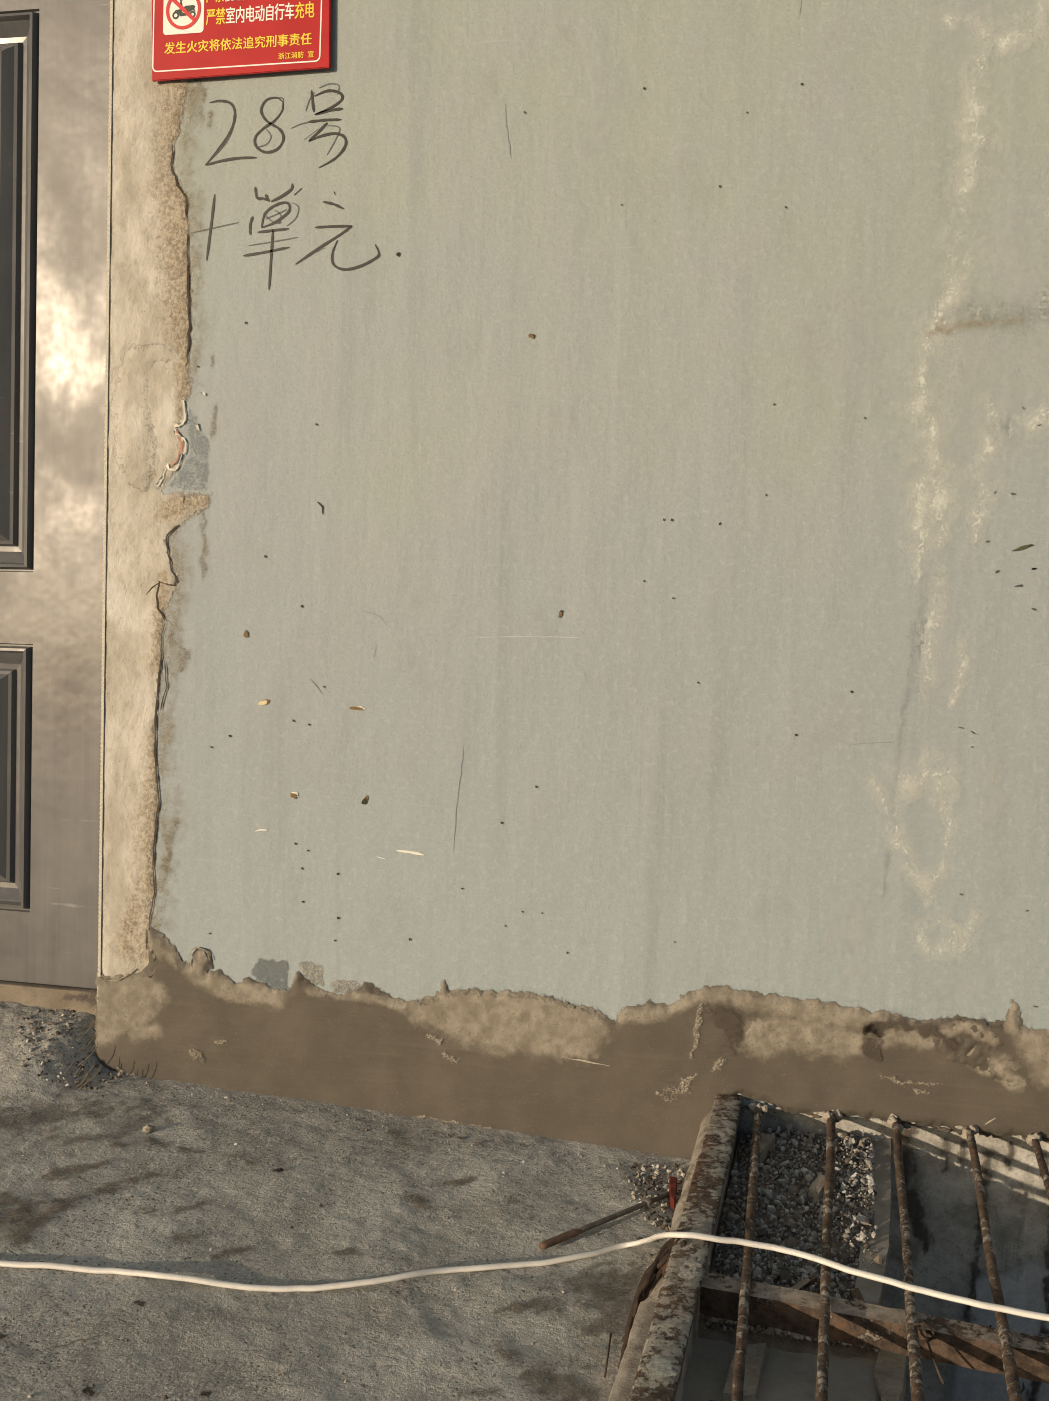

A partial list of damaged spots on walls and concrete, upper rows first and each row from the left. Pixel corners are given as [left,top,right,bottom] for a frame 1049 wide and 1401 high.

peeling [98,0,212,981]
crack [147,499,184,922]
water stain [909,2,1049,682]